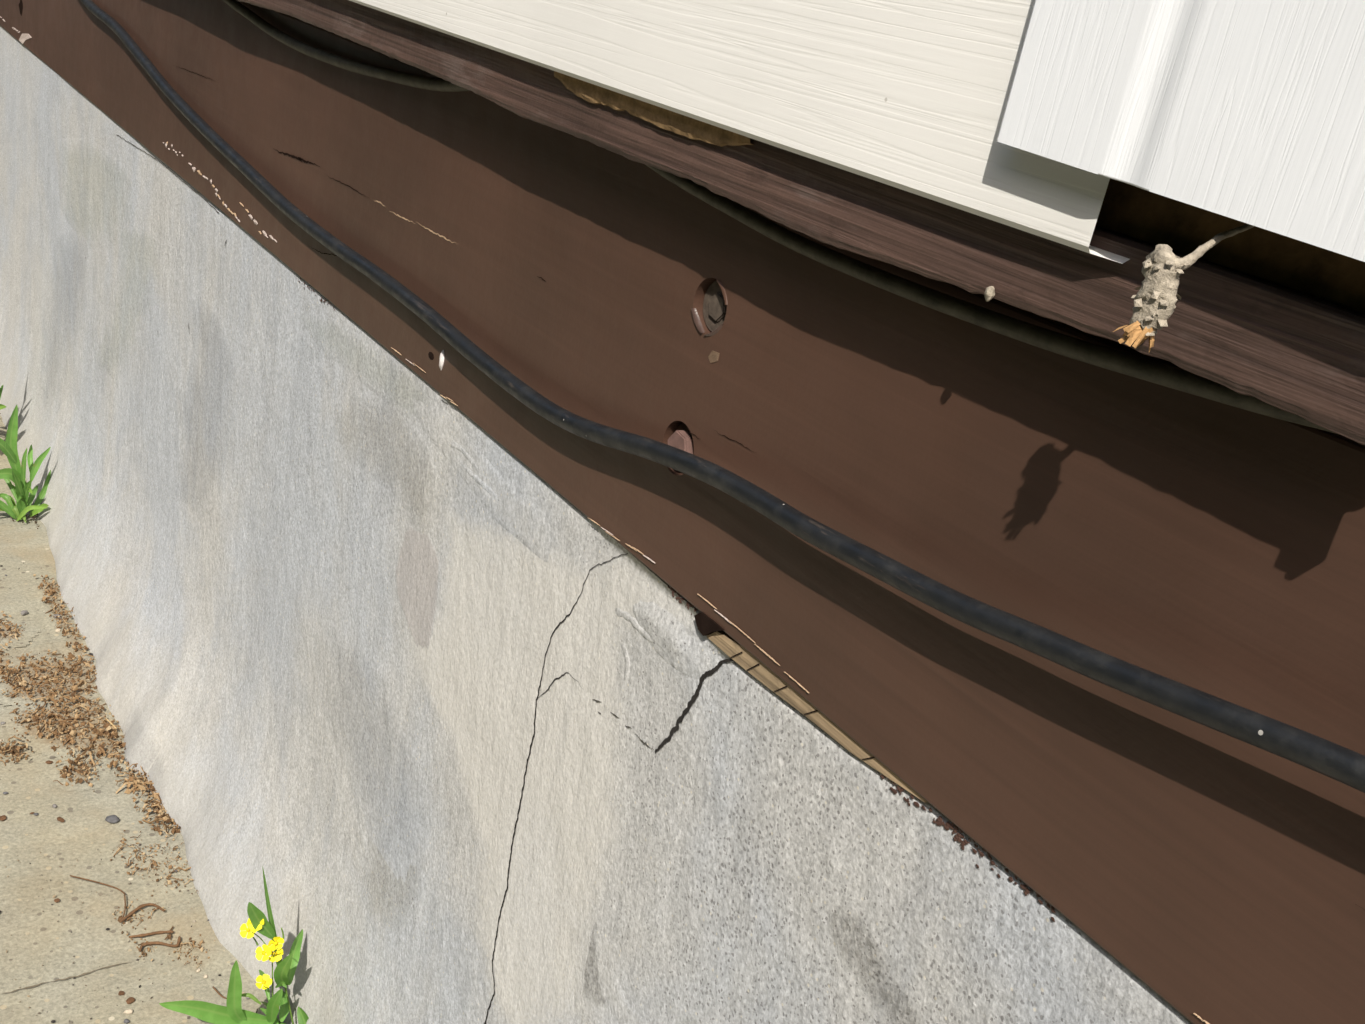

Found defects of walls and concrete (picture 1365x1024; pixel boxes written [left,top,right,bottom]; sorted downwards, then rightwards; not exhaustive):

spalling [0,0,32,44]
peeling [163,141,277,243]
spalling [694,594,809,693]
crack [484,553,734,1024]